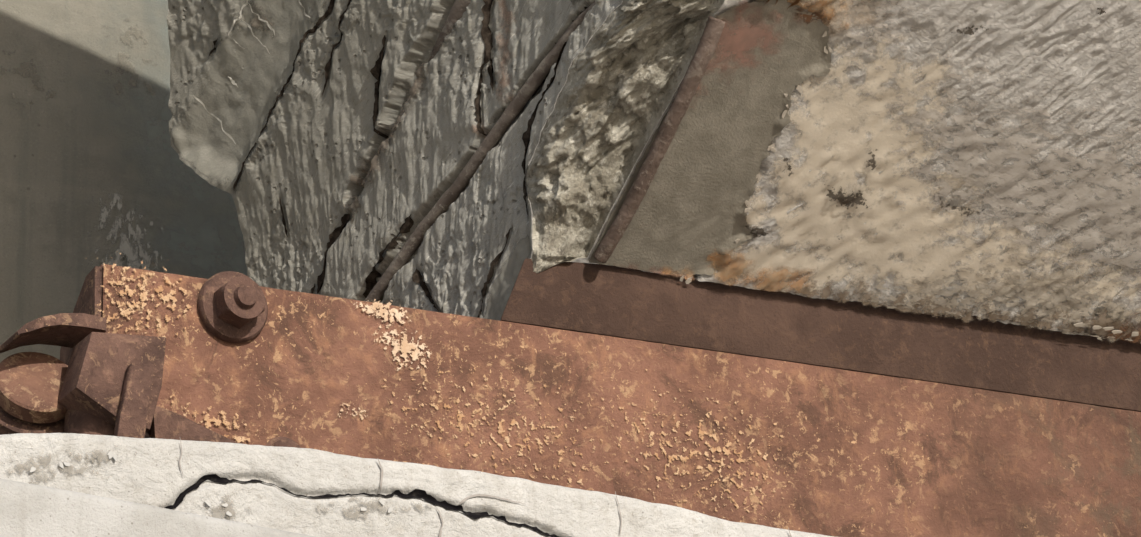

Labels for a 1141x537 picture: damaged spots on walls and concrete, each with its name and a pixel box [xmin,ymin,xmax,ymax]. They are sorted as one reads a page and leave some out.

crack [166,0,622,318]
spalling [353,0,818,523]
rust [787,0,835,24]
peeling [521,0,1141,343]
rust [710,253,1141,343]
crack [165,439,560,537]